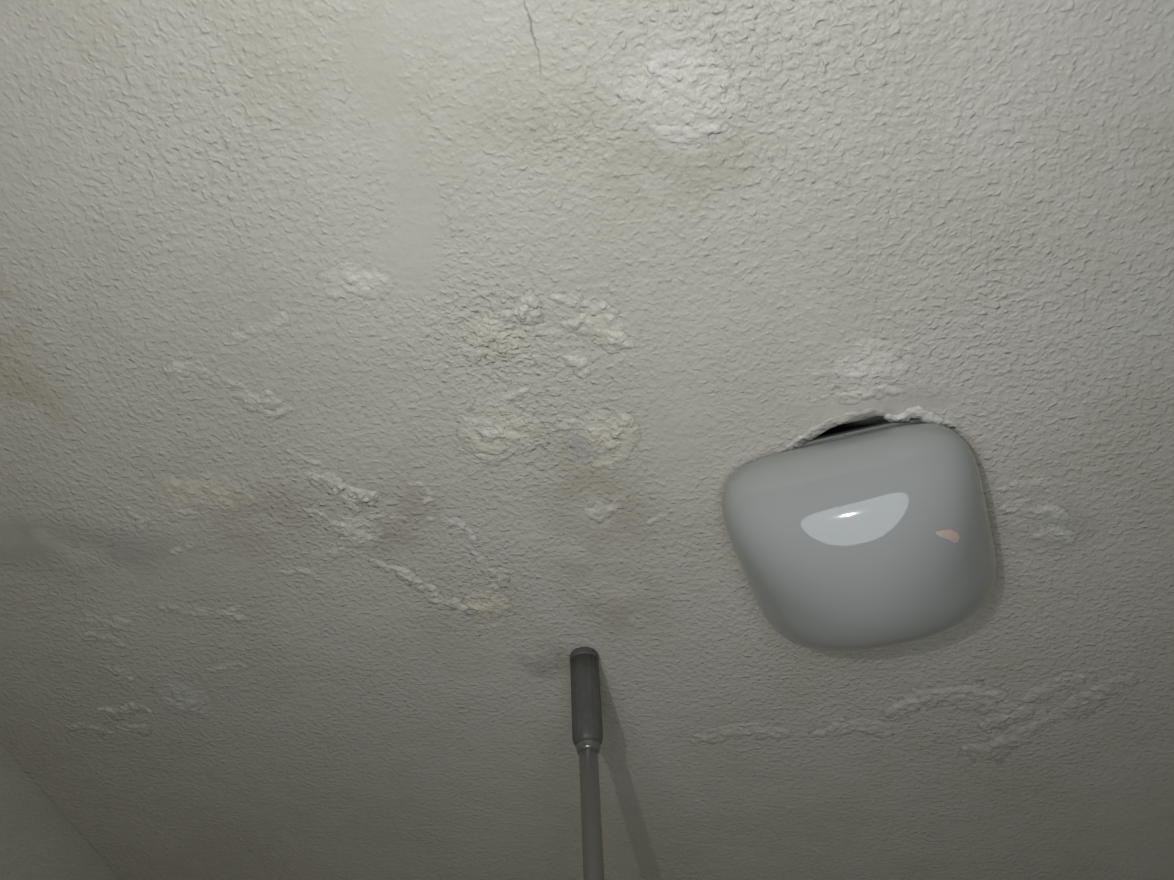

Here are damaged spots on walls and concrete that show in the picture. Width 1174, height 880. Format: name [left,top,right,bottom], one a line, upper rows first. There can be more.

flaking render [785,384,954,448]